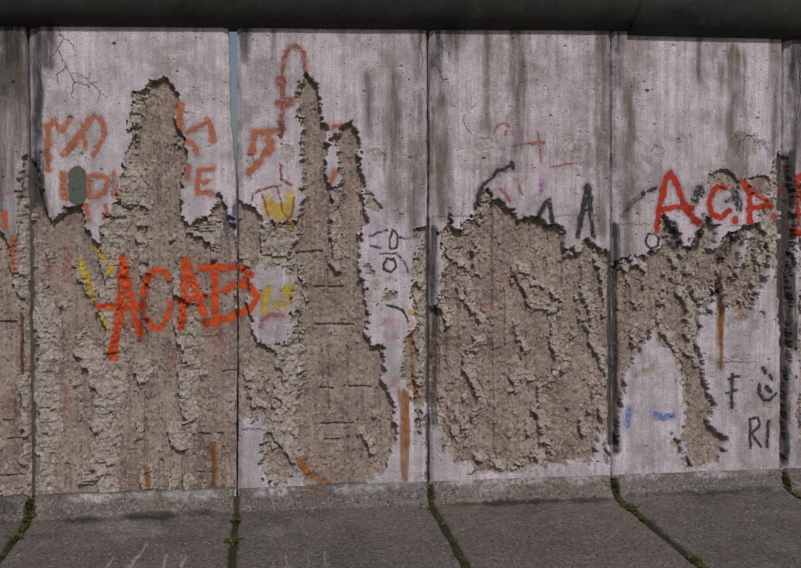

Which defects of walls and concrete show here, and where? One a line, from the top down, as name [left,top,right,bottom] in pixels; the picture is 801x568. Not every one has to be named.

crack [48,28,104,102]
leakage [727,45,740,78]
leakage [625,96,635,139]
leakage [727,90,737,142]
spalling [727,129,766,158]
spalling [0,72,397,503]
spalling [399,154,801,482]
corrosion [714,272,725,369]
corrosion [398,333,417,481]